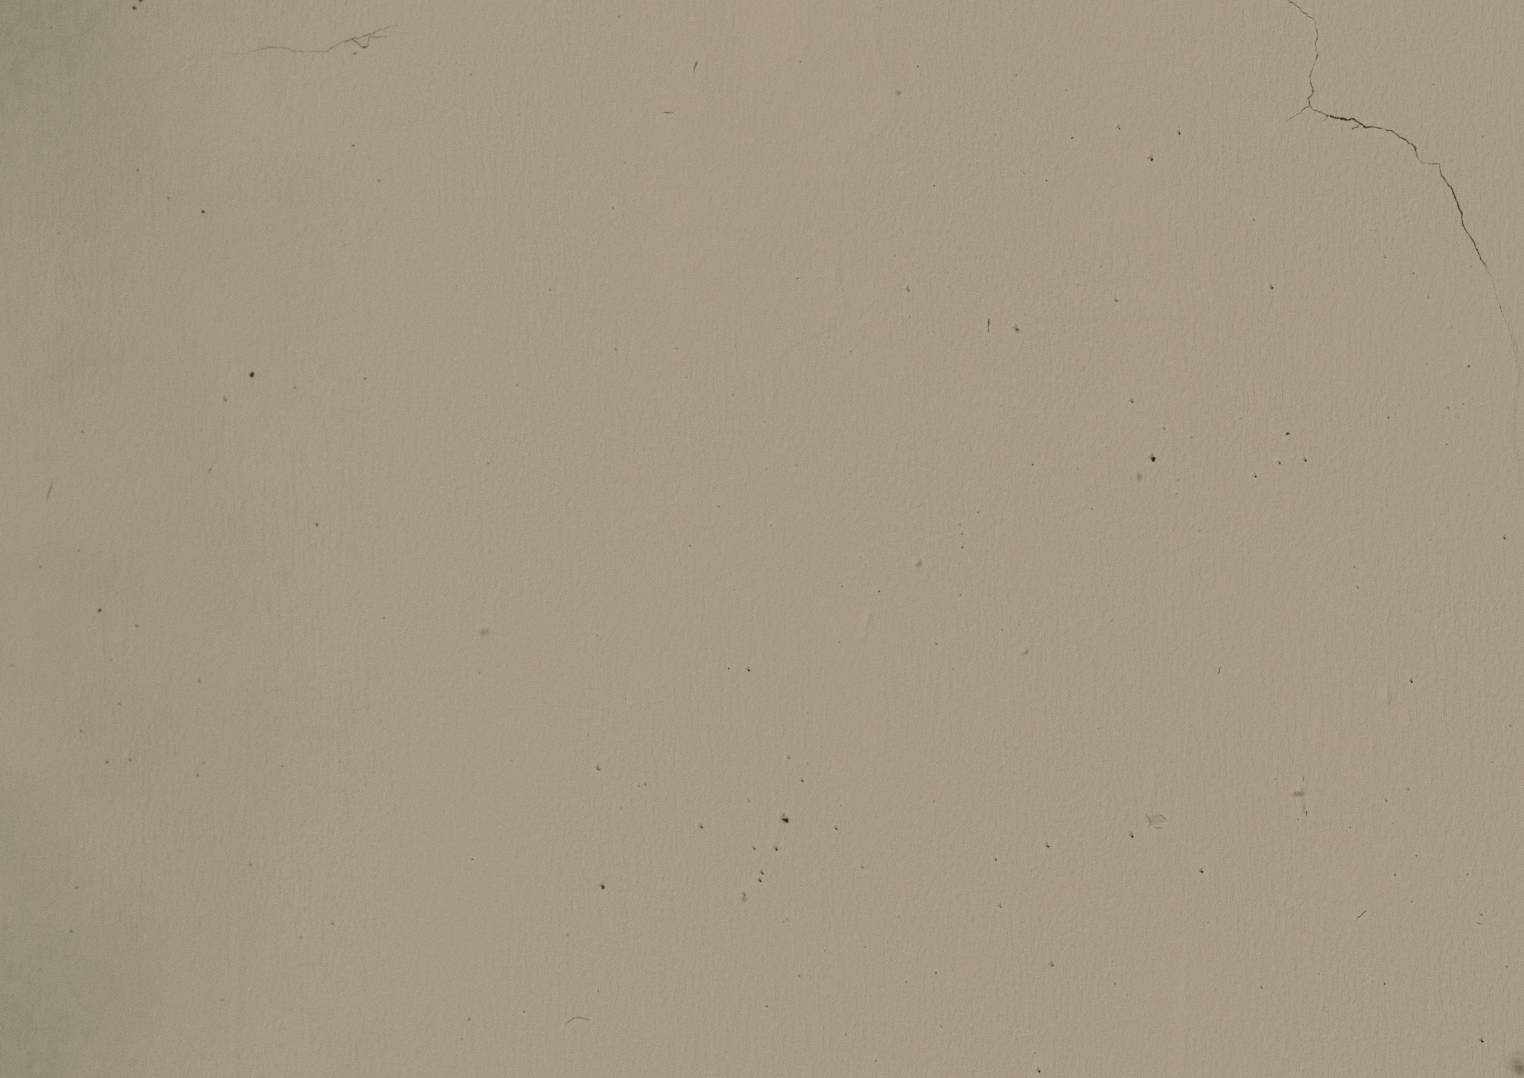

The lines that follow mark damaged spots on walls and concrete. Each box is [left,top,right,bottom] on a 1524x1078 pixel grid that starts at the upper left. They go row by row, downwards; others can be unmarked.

crack [1287,0,1515,355]